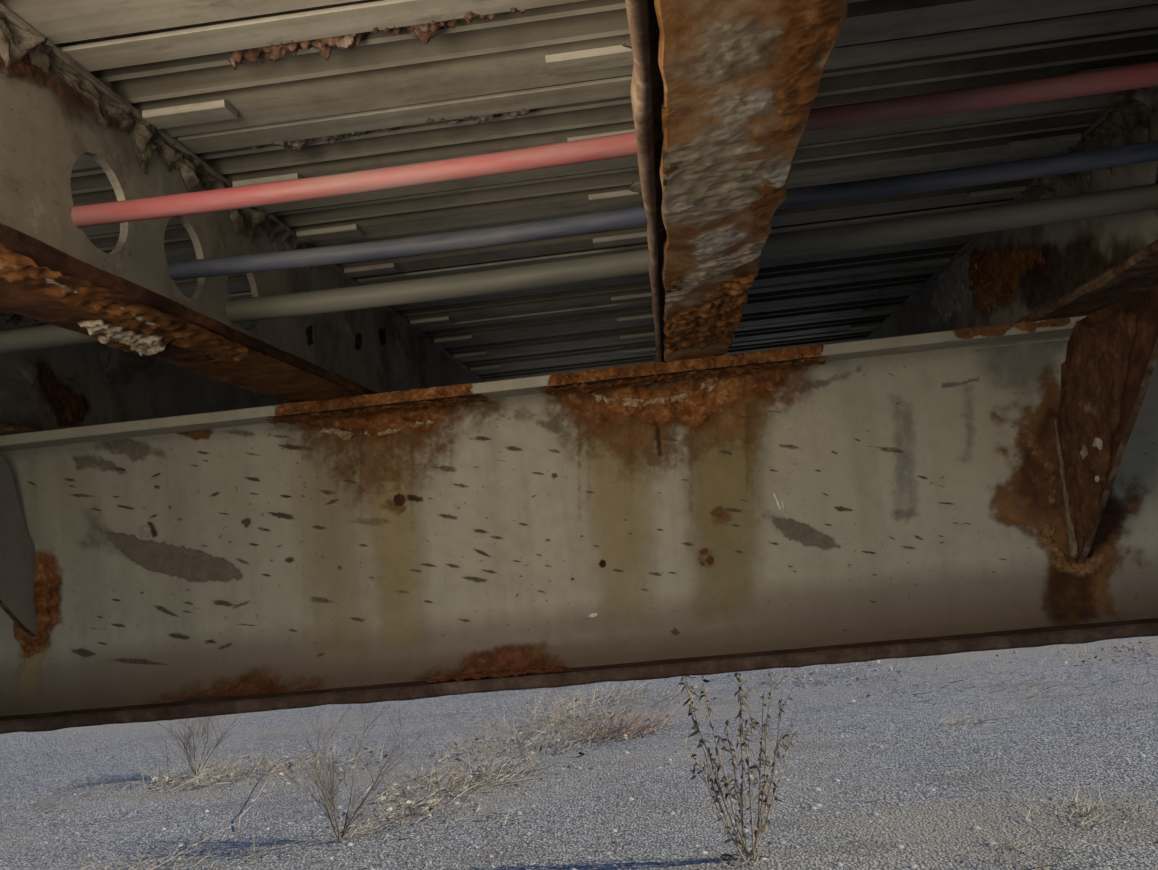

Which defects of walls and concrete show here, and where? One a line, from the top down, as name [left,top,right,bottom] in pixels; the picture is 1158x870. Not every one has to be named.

spalling [0,52,119,128]
corrosion [768,0,843,140]
corrosion [662,106,677,187]
corrosion [748,180,784,237]
peeling [79,308,219,364]
corrosion [953,317,1070,339]
corrosion [0,252,500,636]
corrosion [539,270,827,604]
corrosion [991,370,1147,625]
corrosion [14,552,61,682]
corrosion [419,645,571,683]